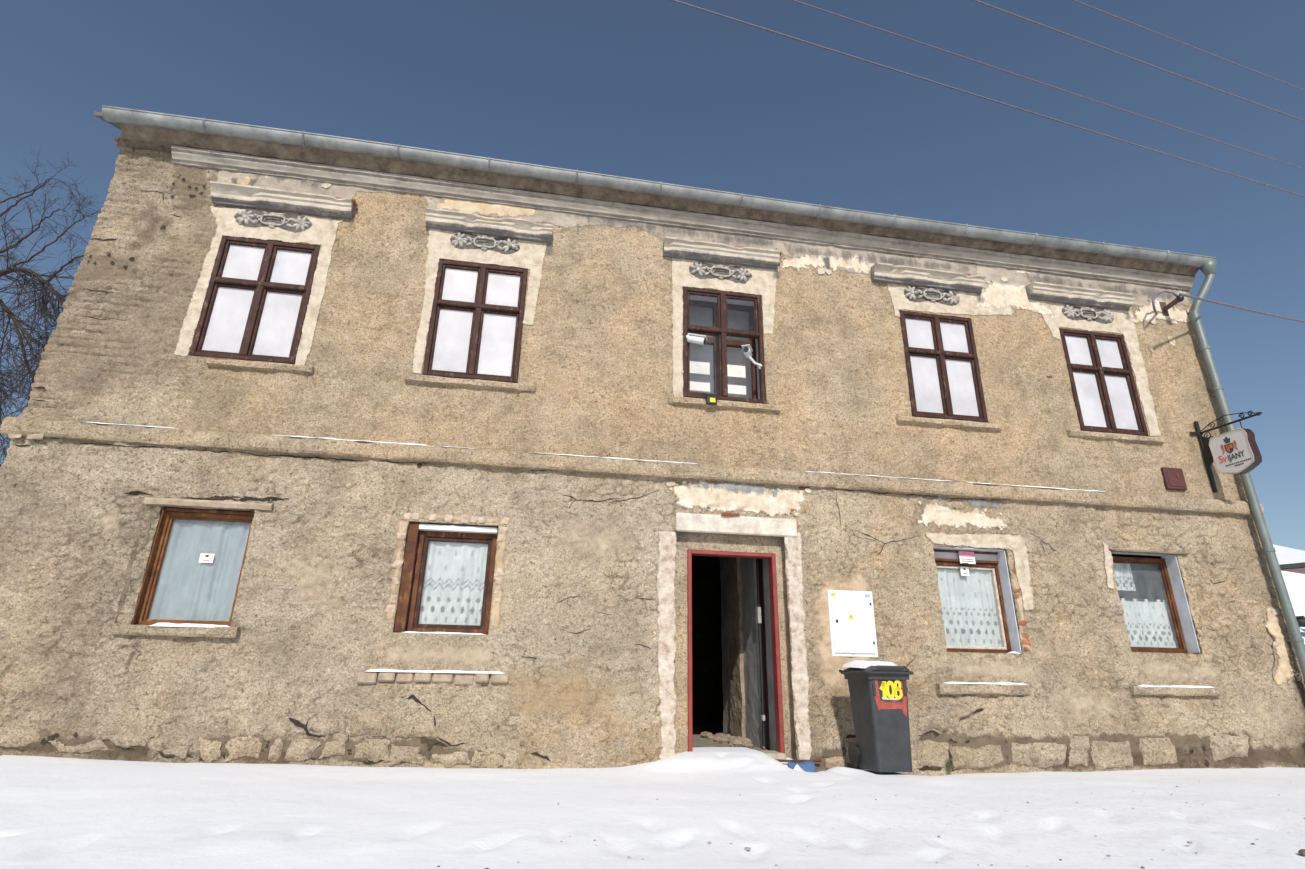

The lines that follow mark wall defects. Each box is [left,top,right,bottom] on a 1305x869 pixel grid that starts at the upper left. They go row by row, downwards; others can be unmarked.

flaking render [782,254,874,275]
flaking render [973,270,1055,323]
flaking render [1131,299,1190,346]
crack [16,437,418,463]
crack [530,470,661,507]
flaking render [666,480,811,517]
flaking render [918,501,1008,530]
crack [111,491,289,629]
crack [73,732,226,761]
crack [261,717,384,765]